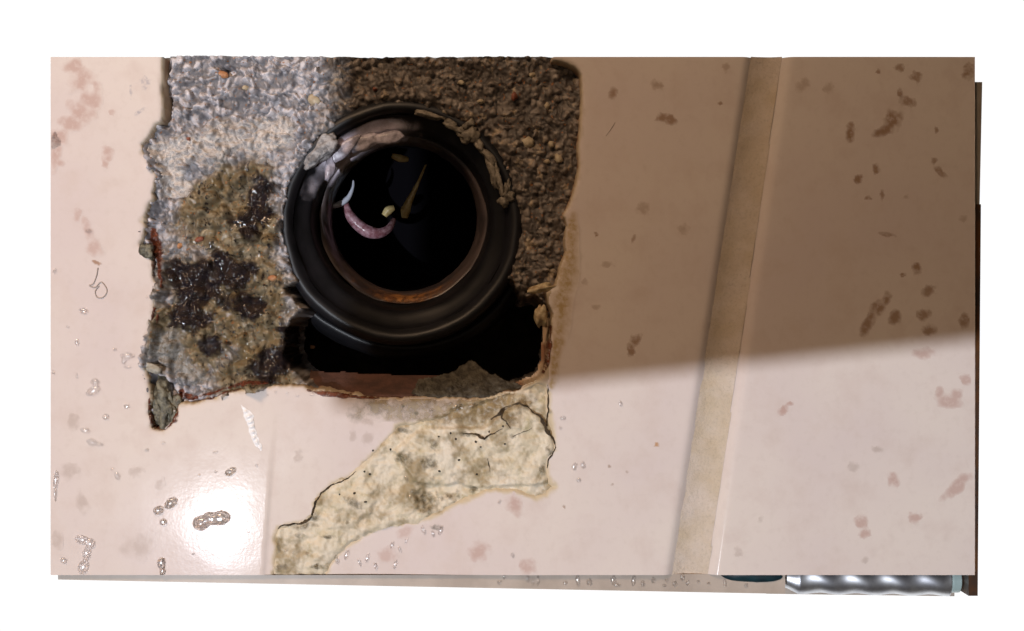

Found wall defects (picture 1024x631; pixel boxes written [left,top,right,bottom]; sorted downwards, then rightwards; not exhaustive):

damp [960,60,974,81]
damp [870,63,923,139]
damp [227,171,280,240]
corrosion [149,228,163,288]
damp [147,249,267,385]
spalling [137,56,580,575]
damp [858,290,903,339]
damp [248,326,303,384]
corrosion [542,325,553,374]
corrosion [148,380,280,430]
corrosion [307,389,380,399]
crack [464,385,556,468]